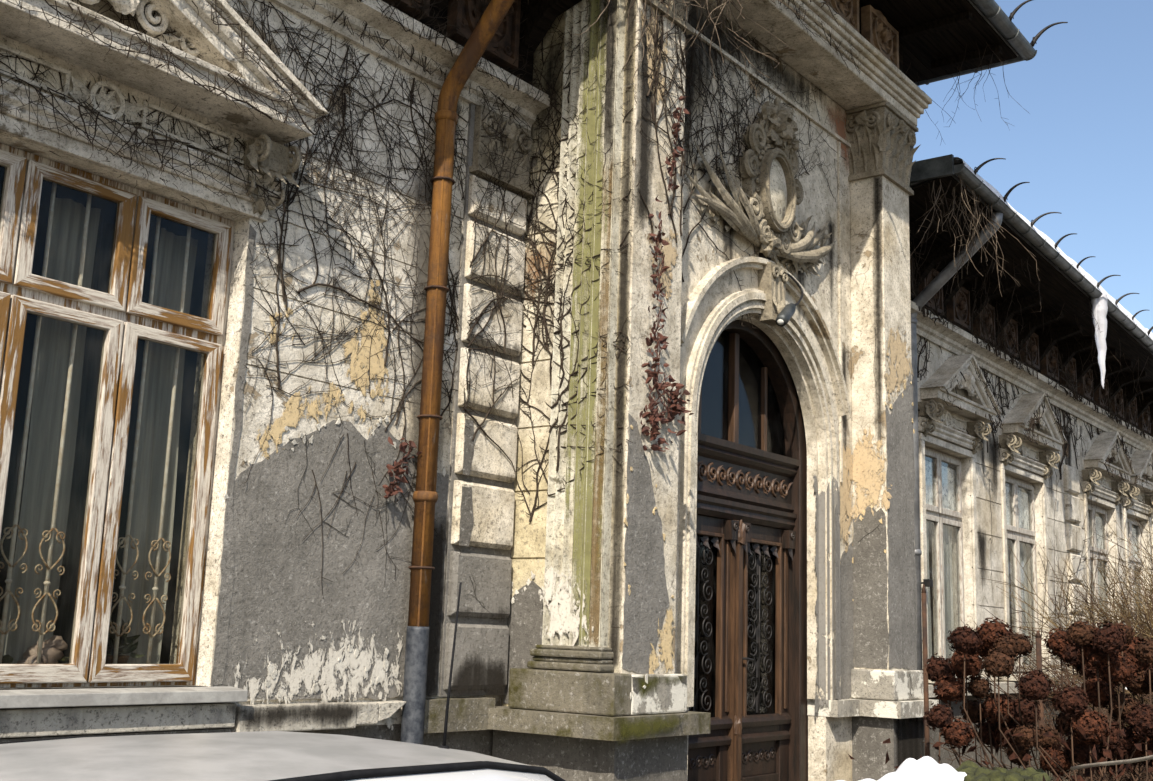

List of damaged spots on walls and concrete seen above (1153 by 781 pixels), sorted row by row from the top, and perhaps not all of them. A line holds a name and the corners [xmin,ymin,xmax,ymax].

flaking render [210,224,417,705]
flaking render [432,419,474,695]
flaking render [813,323,917,712]